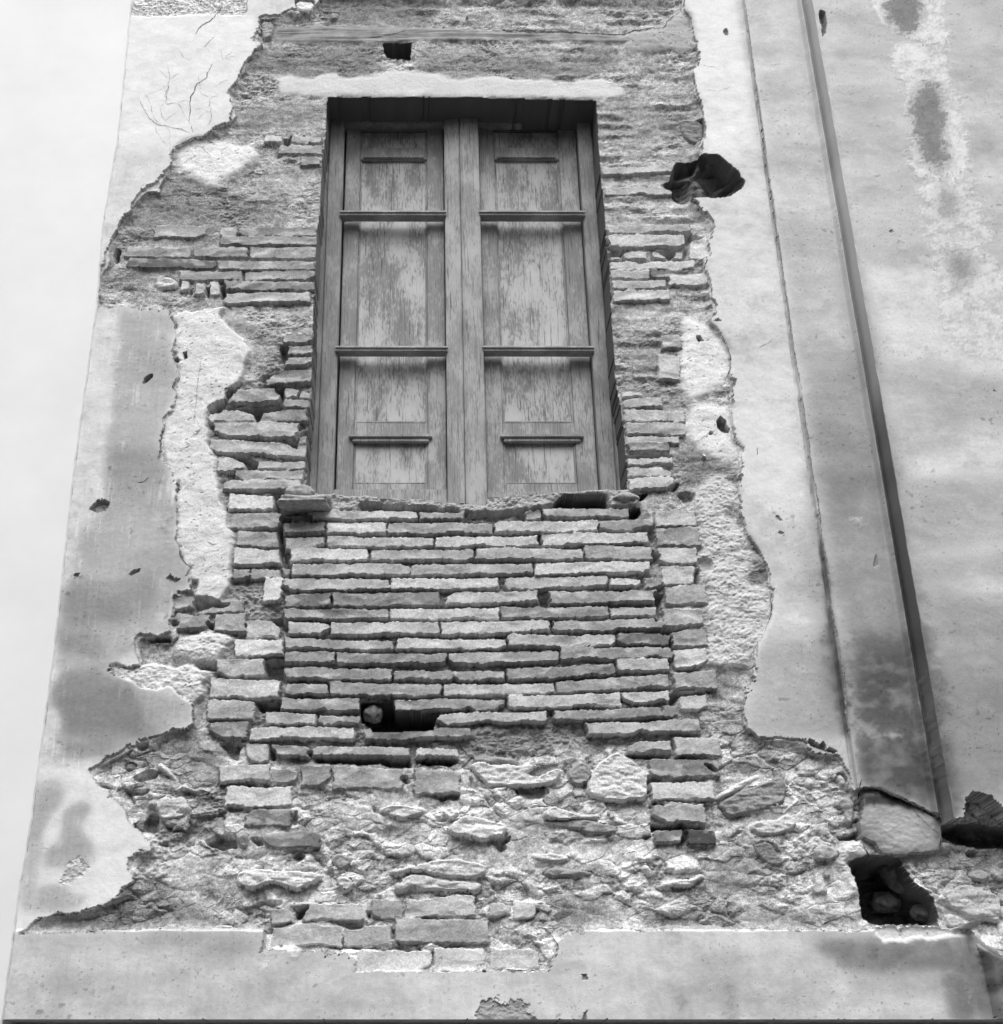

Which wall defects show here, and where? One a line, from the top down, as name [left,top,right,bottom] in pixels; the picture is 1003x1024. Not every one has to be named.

crack [140,8,232,166]
flaking render [819,10,827,36]
leakage [871,0,1003,359]
flaking render [99,0,745,769]
flaking render [90,498,110,513]
flaking render [689,475,775,670]
flaking render [21,640,1003,974]
flaking render [475,994,538,1019]